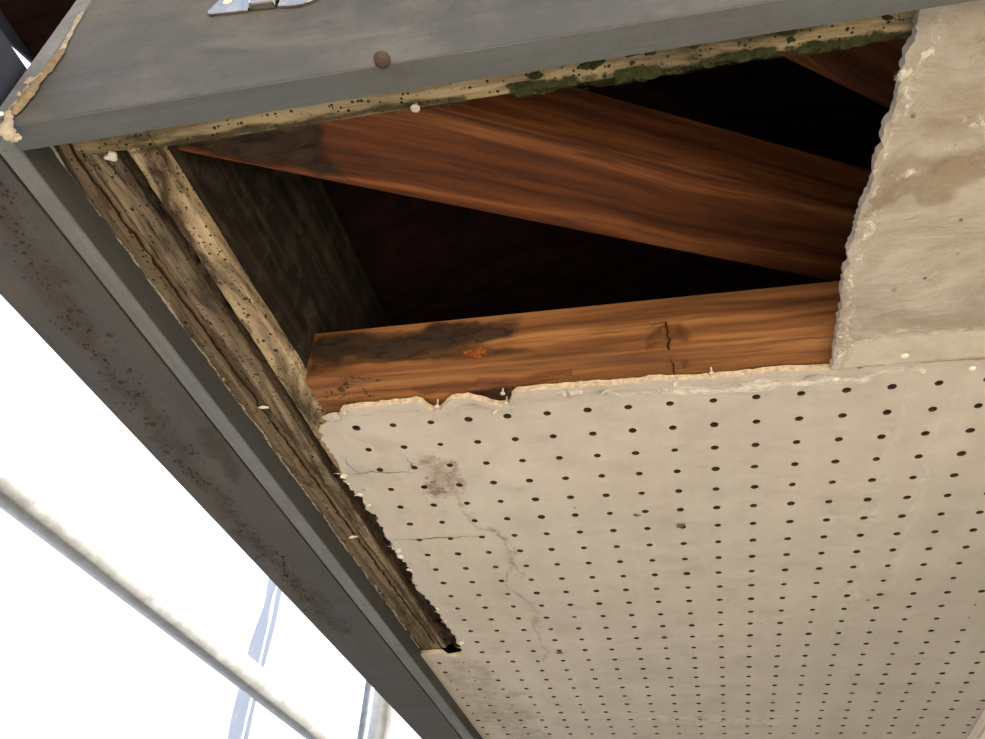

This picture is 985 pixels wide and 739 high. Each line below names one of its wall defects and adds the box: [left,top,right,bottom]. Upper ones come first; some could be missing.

spalling [890,19,941,136]
water stain [874,154,985,211]
water stain [0,168,354,638]
crack [68,143,435,643]
water stain [310,321,516,370]
peeling [322,210,985,423]
crack [648,321,675,375]
water stain [325,451,452,646]